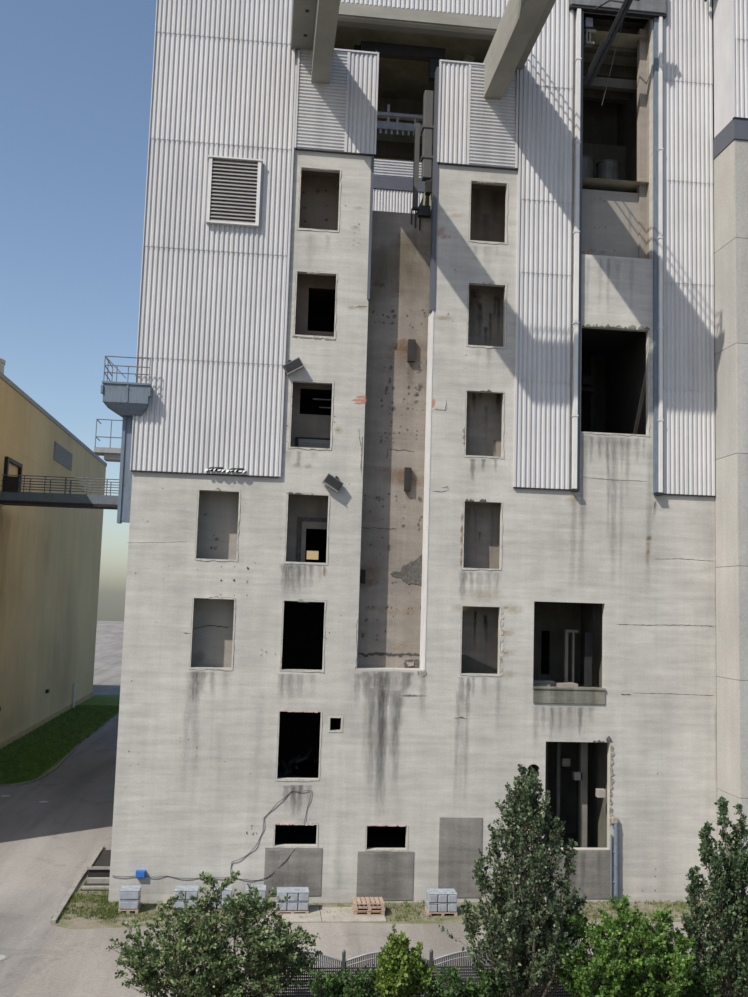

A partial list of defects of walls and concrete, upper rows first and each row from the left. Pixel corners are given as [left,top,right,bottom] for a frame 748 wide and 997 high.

spalling [387,554,422,594]
spalling [404,659,427,677]